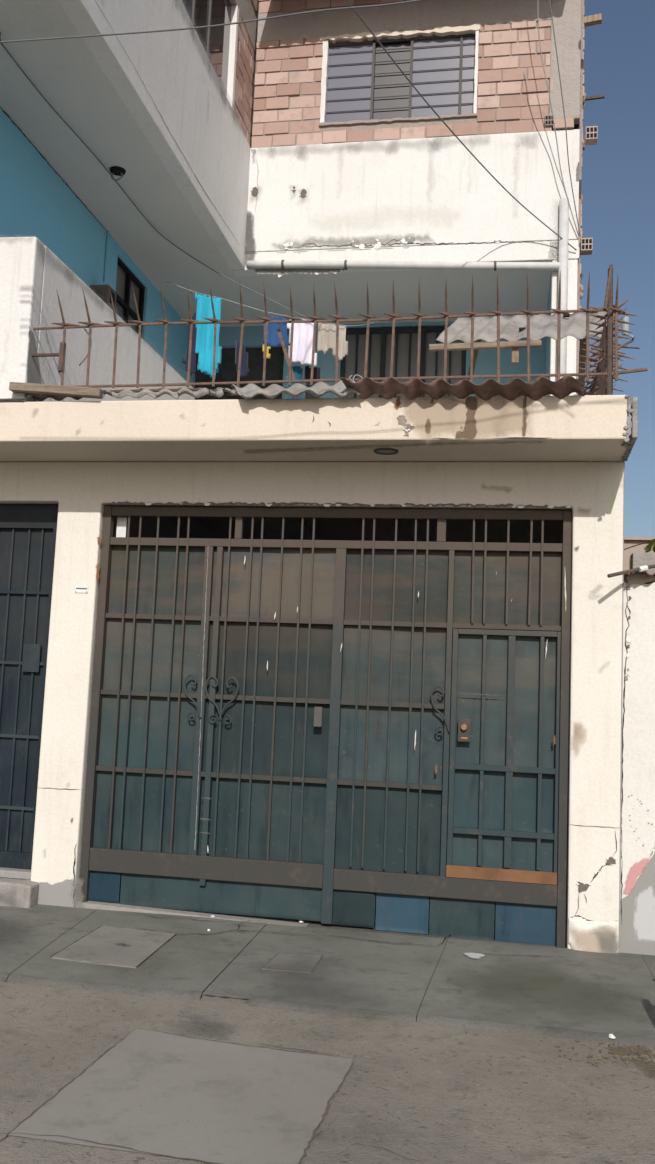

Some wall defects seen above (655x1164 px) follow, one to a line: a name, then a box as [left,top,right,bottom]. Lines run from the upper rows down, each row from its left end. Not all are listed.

peeling [351,239,381,250]
peeling [397,414,415,436]
crack [568,578,645,925]